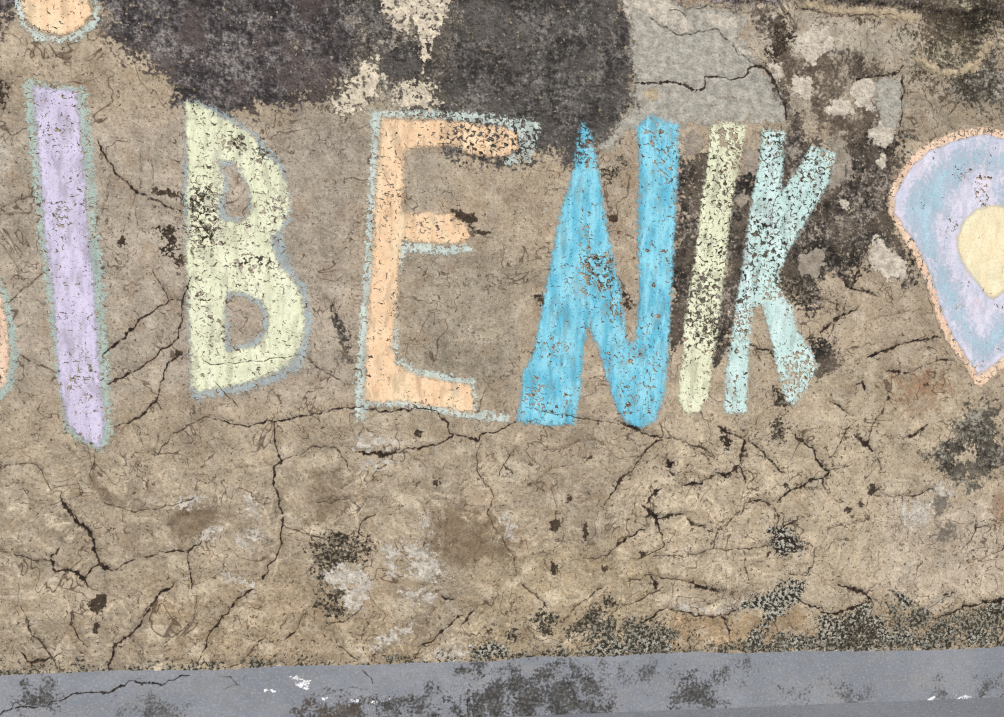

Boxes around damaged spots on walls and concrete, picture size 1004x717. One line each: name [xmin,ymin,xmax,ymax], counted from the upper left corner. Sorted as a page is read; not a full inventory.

damp [0,67,10,112]
damp [0,0,25,41]
damp [93,0,369,171]
damp [427,0,644,186]
crack [635,4,788,120]
crack [0,269,957,713]
damp [917,396,1004,541]
crack [961,519,1004,563]
crack [799,584,1004,621]
damp [289,655,759,717]